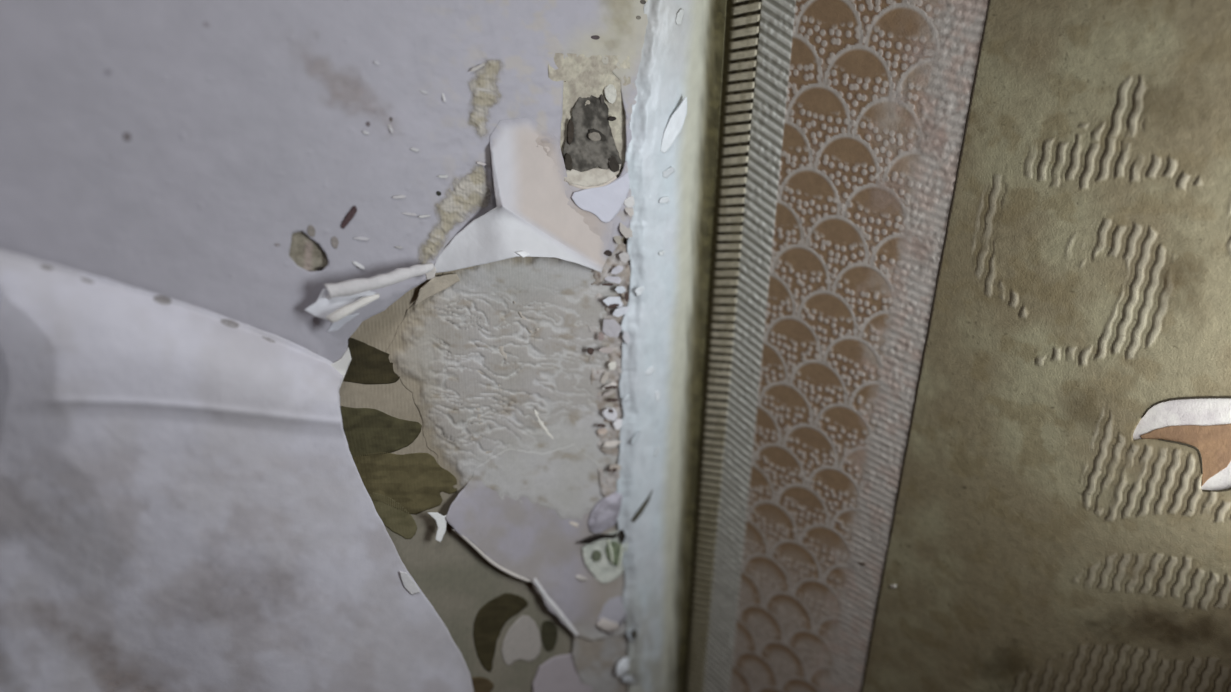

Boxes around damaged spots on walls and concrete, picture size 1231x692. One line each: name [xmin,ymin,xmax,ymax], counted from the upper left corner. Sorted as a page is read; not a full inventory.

peeling [469,60,501,136]
peeling [660,97,687,153]
peeling [274,206,369,271]
peeling [392,161,491,264]
spalling [548,53,652,583]
peeling [596,596,637,641]
peeling [616,657,634,684]